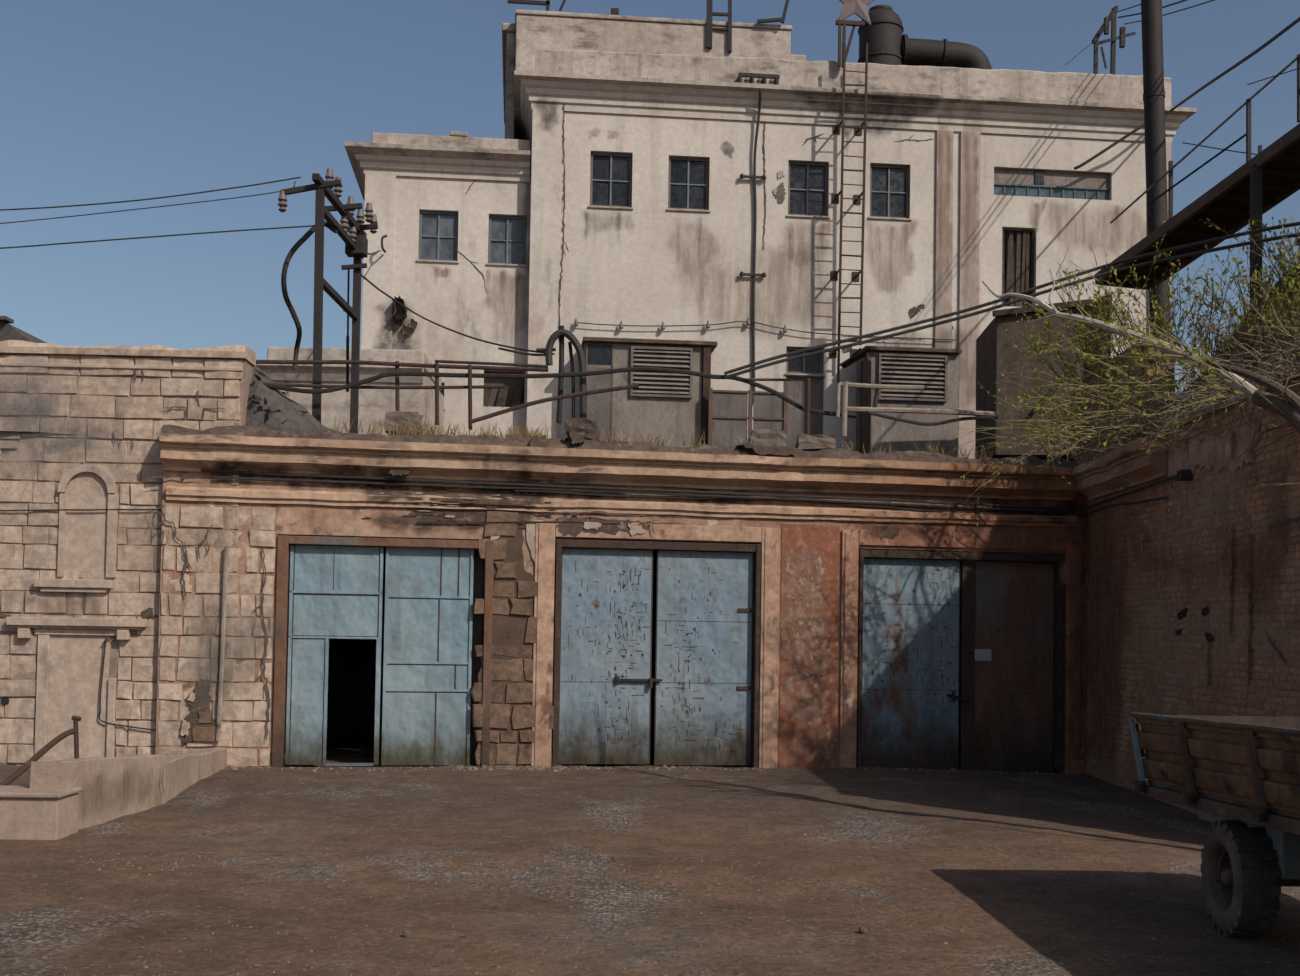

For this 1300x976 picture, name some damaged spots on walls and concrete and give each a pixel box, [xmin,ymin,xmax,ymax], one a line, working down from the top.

crack [152,471,213,596]
flaking render [362,468,650,767]
spalling [180,679,218,743]